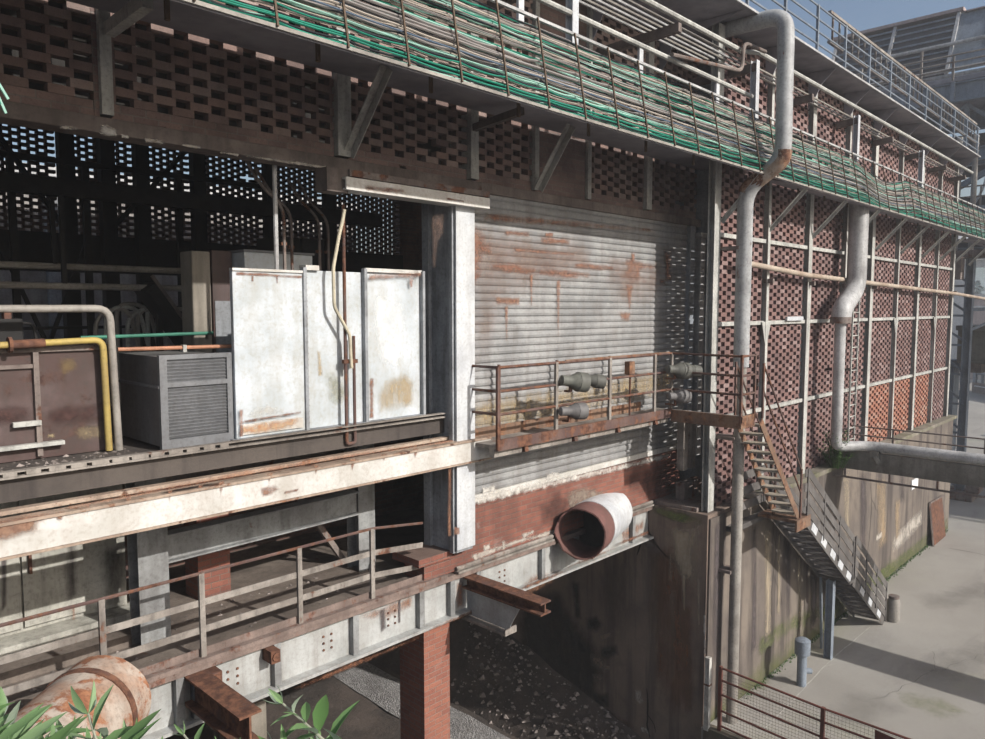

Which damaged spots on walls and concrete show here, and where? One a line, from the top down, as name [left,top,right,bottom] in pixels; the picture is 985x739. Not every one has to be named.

corrosion [475,233,491,279]
corrosion [492,215,612,308]
corrosion [0,410,26,422]
corrosion [240,410,299,436]
corrosion [197,471,254,489]
corrosion [0,514,43,539]
water stain [670,530,695,611]
corrosion [322,654,378,678]